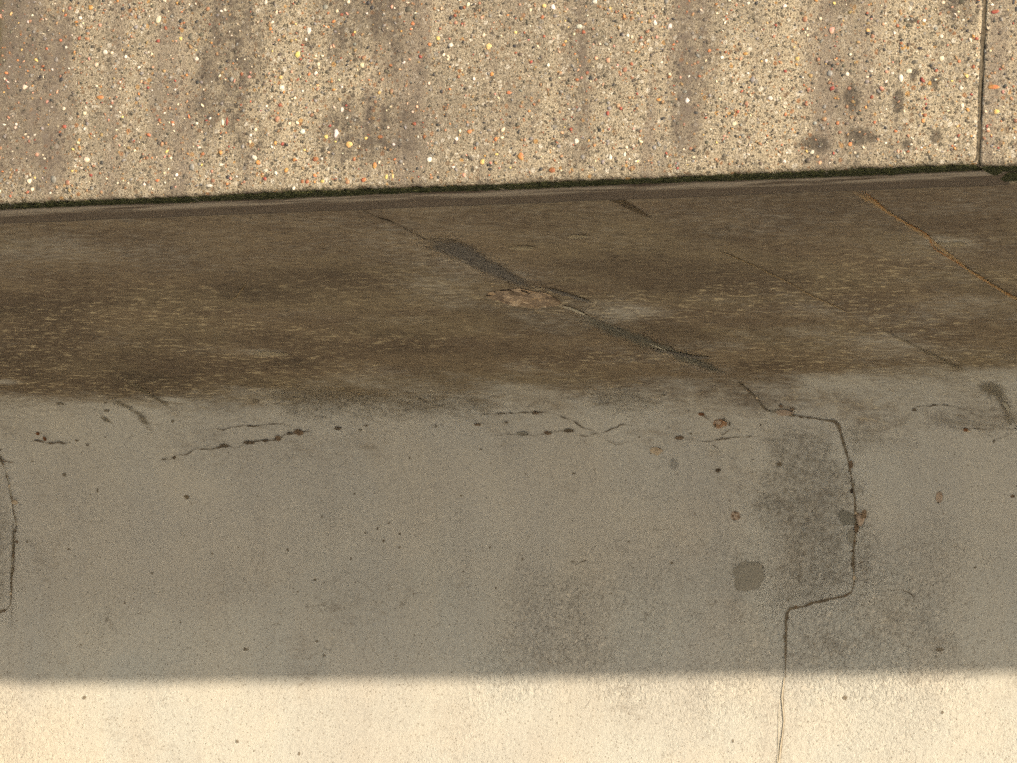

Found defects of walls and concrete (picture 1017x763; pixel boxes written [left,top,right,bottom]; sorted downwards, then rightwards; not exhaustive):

leakage [203,0,251,124]
crack [161,424,310,460]
crack [474,400,634,445]
crack [675,436,757,452]